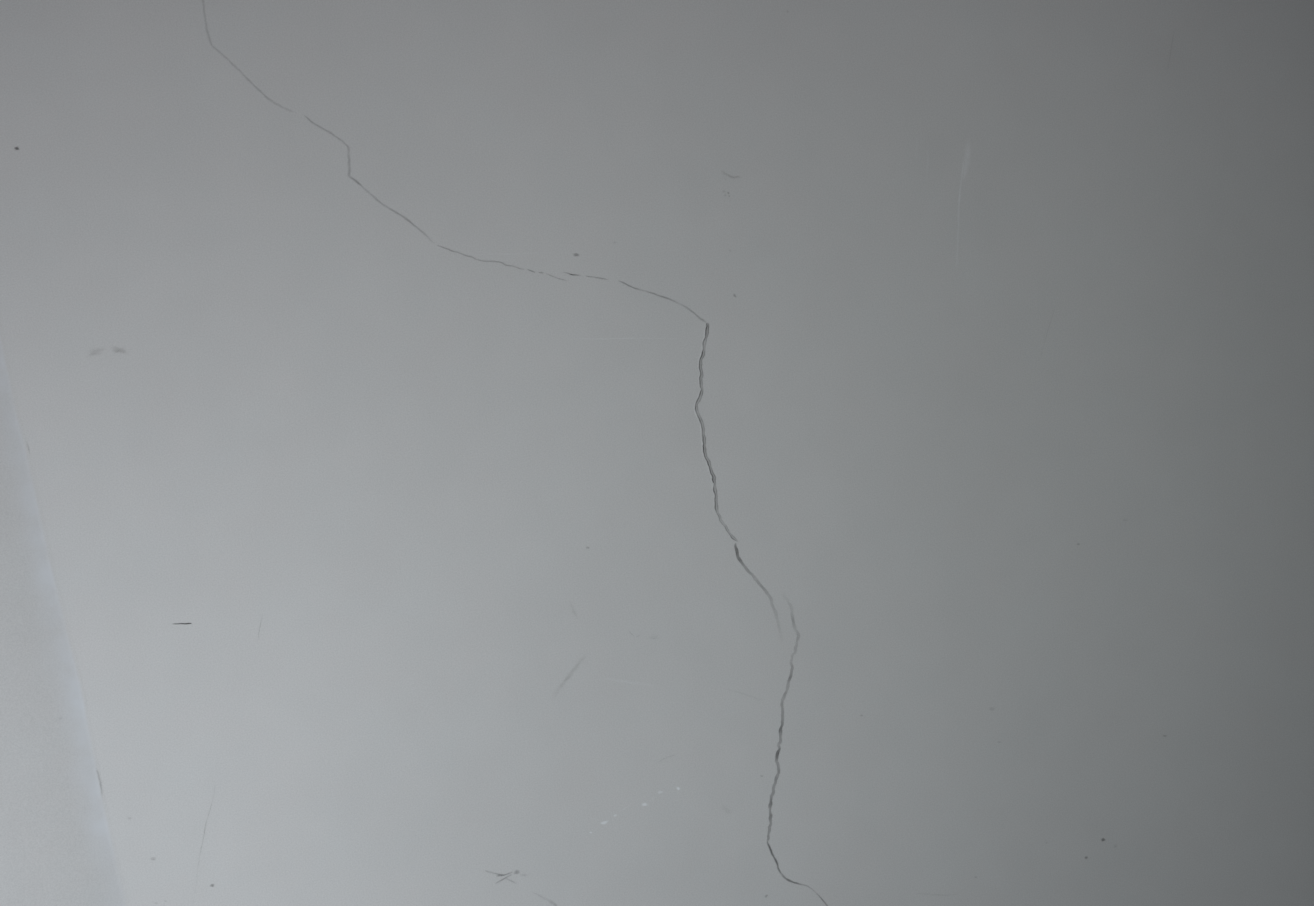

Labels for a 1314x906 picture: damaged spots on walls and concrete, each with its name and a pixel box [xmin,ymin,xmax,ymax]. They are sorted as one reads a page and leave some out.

crack [693,324,715,510]